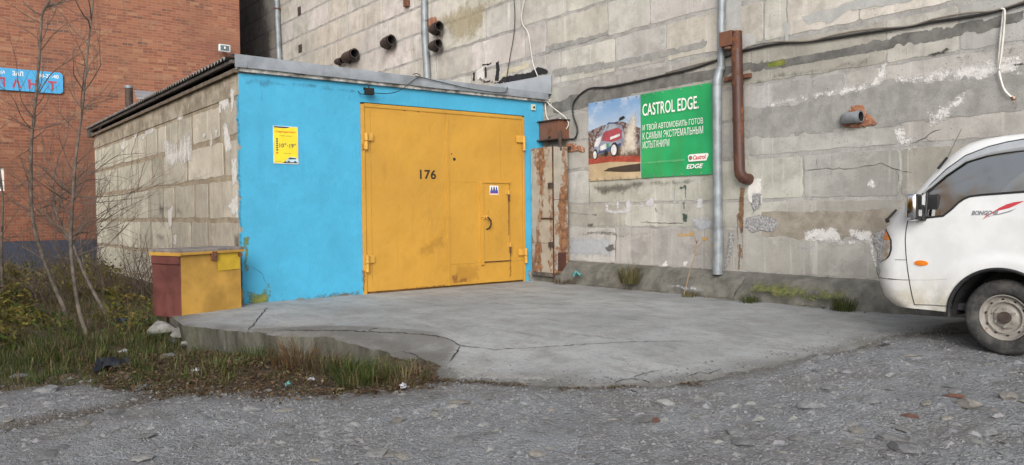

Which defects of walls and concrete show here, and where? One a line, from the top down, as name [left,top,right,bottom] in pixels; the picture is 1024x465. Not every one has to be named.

rust [737,188,745,269]
spalling [745,193,779,233]